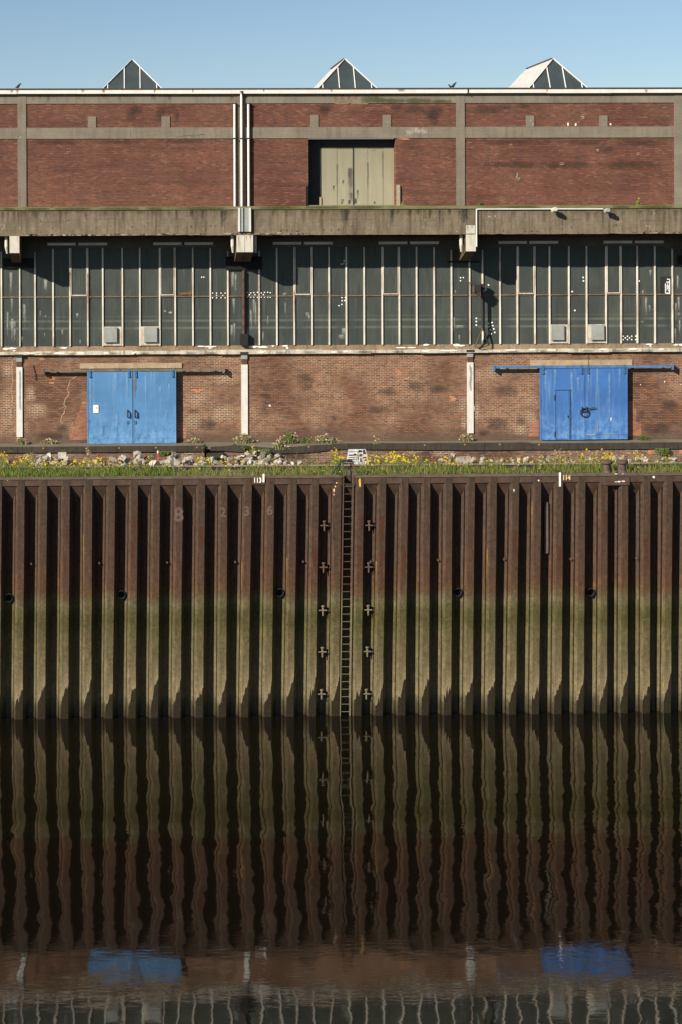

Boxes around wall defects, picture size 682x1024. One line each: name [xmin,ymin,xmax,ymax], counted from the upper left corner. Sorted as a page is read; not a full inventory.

leakage [15,681,23,720]
leakage [128,684,136,718]
leakage [421,670,429,715]
leakage [620,669,628,713]